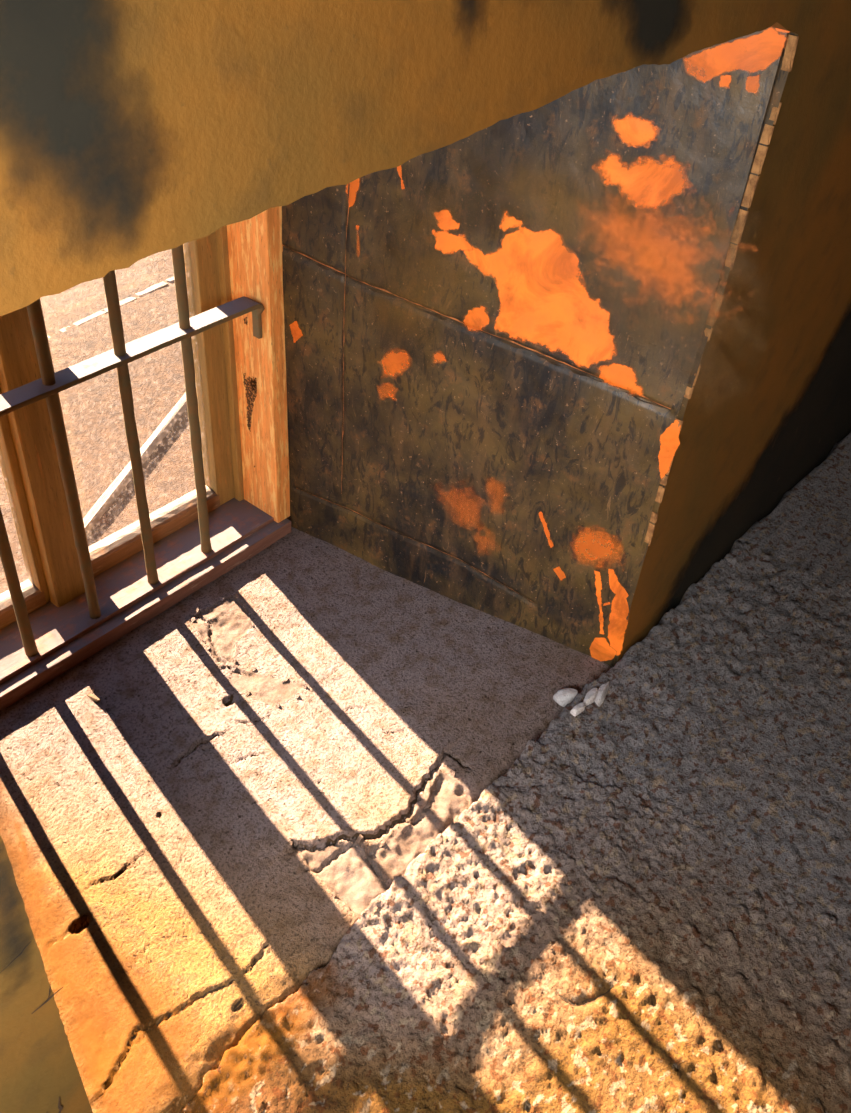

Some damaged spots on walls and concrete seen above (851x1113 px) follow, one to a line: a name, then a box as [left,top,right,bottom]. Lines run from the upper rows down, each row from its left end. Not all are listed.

crack [292,753,468,874]
crack [105,944,269,1088]